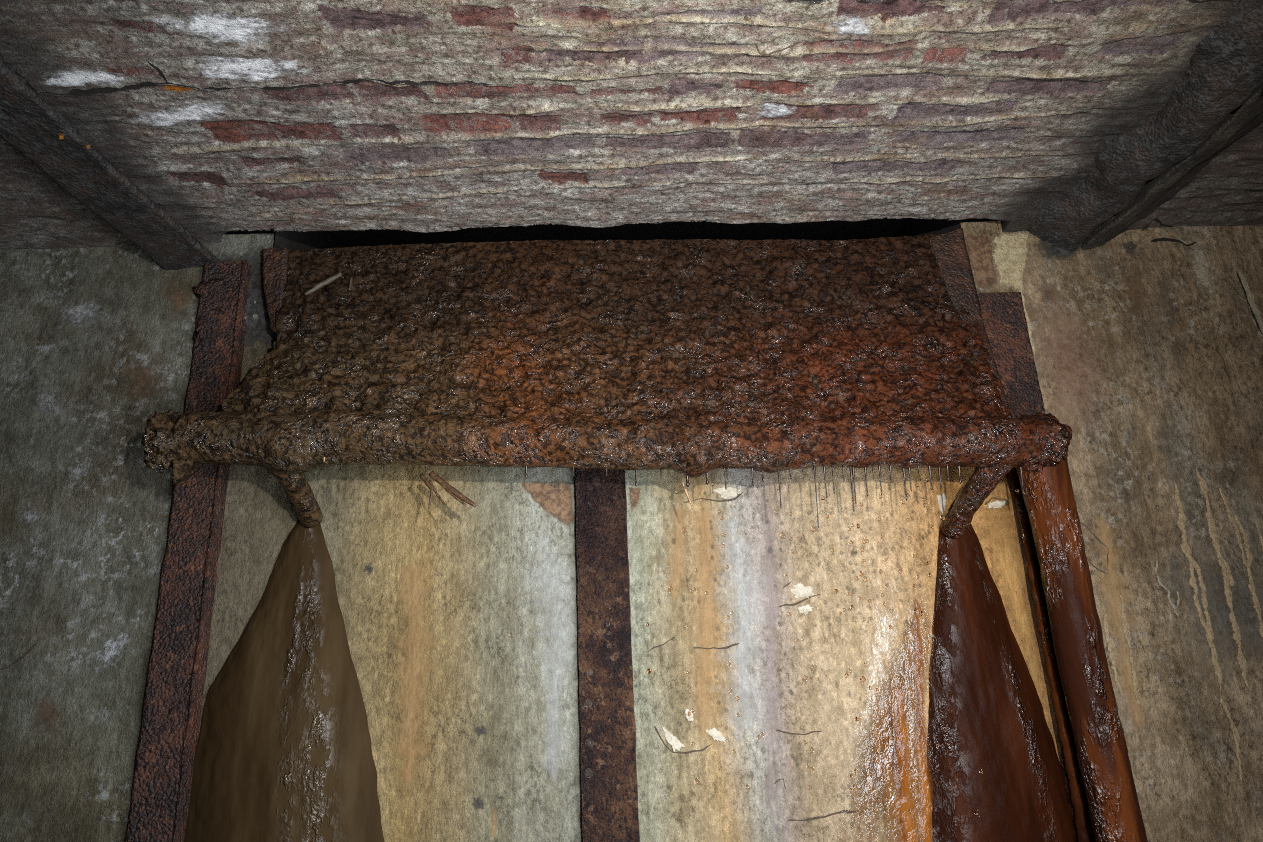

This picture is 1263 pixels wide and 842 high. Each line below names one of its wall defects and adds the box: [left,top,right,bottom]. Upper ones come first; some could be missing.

crack [1237,273,1263,334]
leakage [855,600,933,842]
rust [927,524,1076,842]
leakage [1155,467,1263,781]